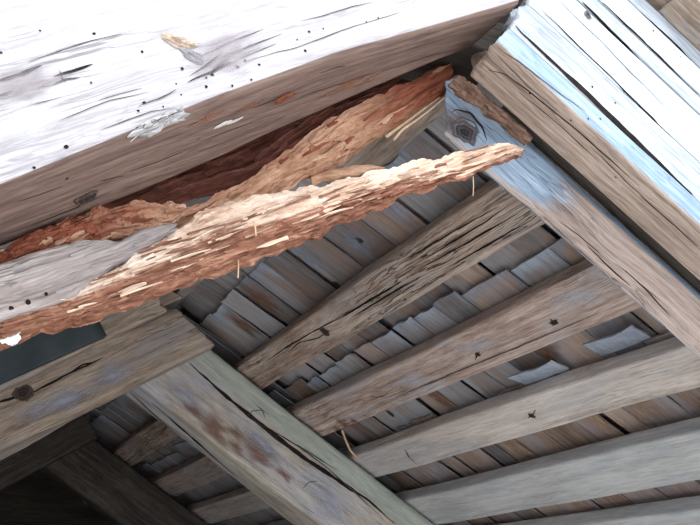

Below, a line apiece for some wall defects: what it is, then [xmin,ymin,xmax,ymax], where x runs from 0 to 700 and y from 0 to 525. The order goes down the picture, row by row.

peeling [0,72,53,97]
spalling [127,106,190,142]
peeling [204,78,411,177]
peeling [39,145,525,313]
crack [265,204,530,362]
crack [0,357,104,402]
corrosion [187,405,270,464]
crack [189,362,395,524]